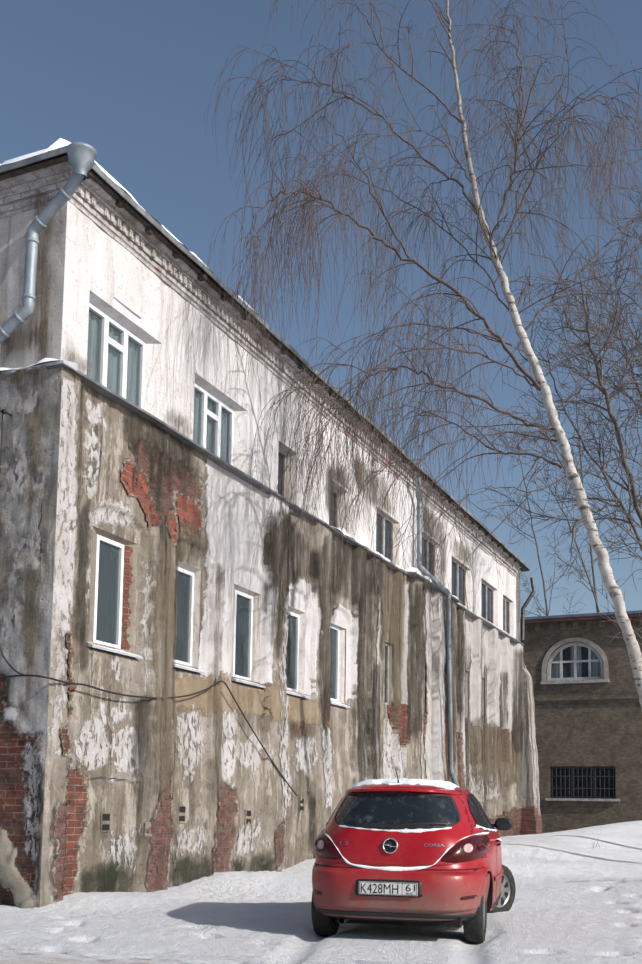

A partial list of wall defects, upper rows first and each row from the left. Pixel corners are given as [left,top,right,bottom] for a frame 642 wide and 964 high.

leakage [77,383,90,667]
leakage [124,410,208,806]
peeling [0,377,359,902]
leakage [264,509,425,781]
peeling [363,575,447,781]
leakage [424,507,473,586]
leakage [445,602,525,813]
peeling [456,610,524,802]
spalling [0,884,16,906]
leakage [83,863,132,893]
leakage [174,856,214,887]
spalling [486,807,523,837]